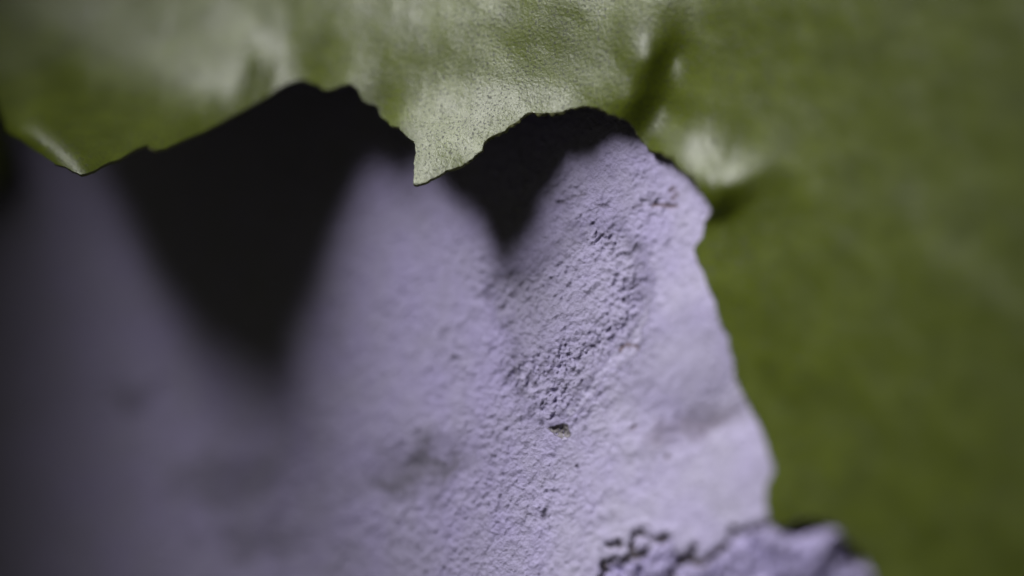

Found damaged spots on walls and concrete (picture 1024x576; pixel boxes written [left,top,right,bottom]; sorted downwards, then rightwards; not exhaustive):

peeling [0,0,785,243]
flaking render [488,224,653,441]
peeling [666,0,1024,576]
flaking render [603,540,678,576]